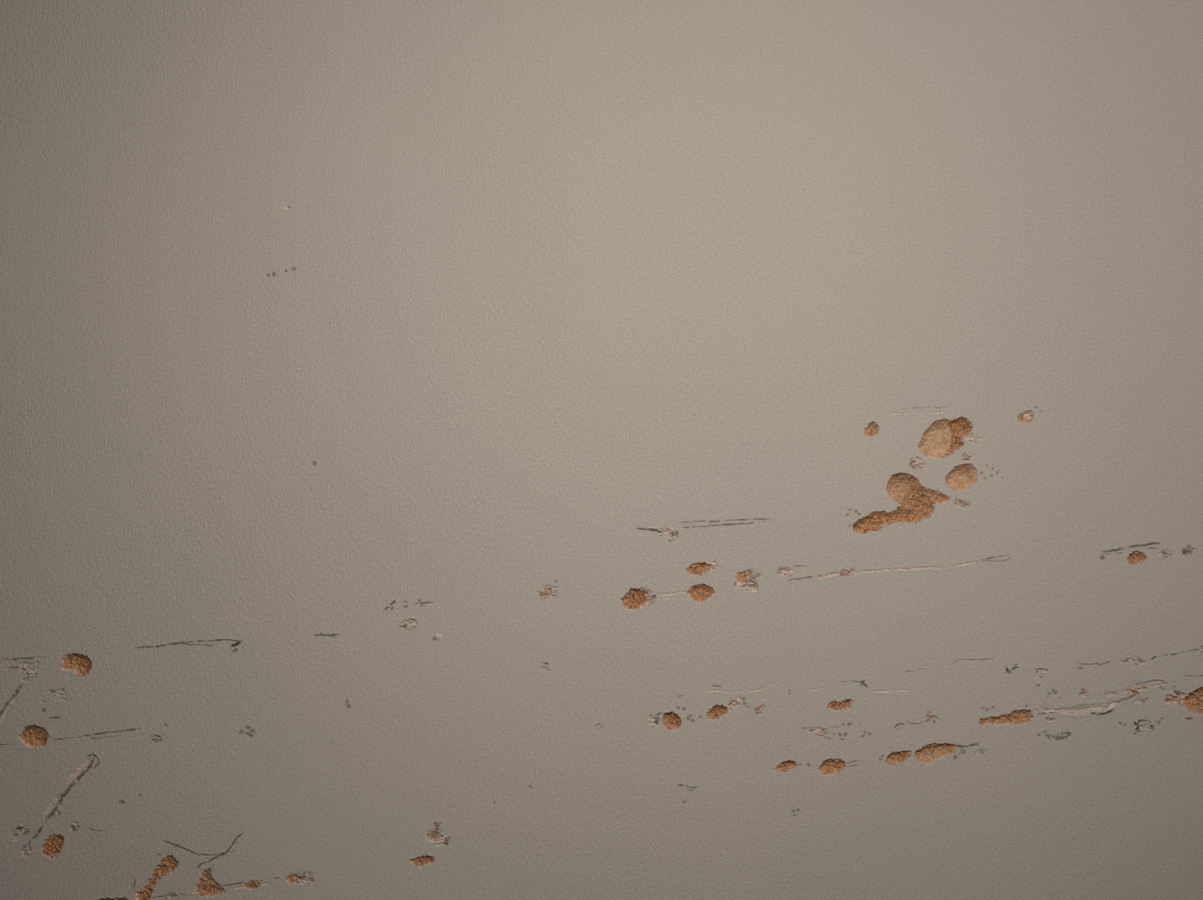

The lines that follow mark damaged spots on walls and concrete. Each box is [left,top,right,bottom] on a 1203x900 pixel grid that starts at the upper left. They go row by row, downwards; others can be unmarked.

spalling [845,415,984,536]
spalling [685,559,720,604]
spalling [620,587,657,612]
crack [1,656,48,670]
spalling [60,652,93,678]
spalling [17,687,69,749]
spalling [647,697,767,732]
spalling [979,705,1035,727]
spalling [1164,674,1203,722]
spalling [771,758,863,778]
spalling [879,742,988,766]
spalling [97,854,180,900]